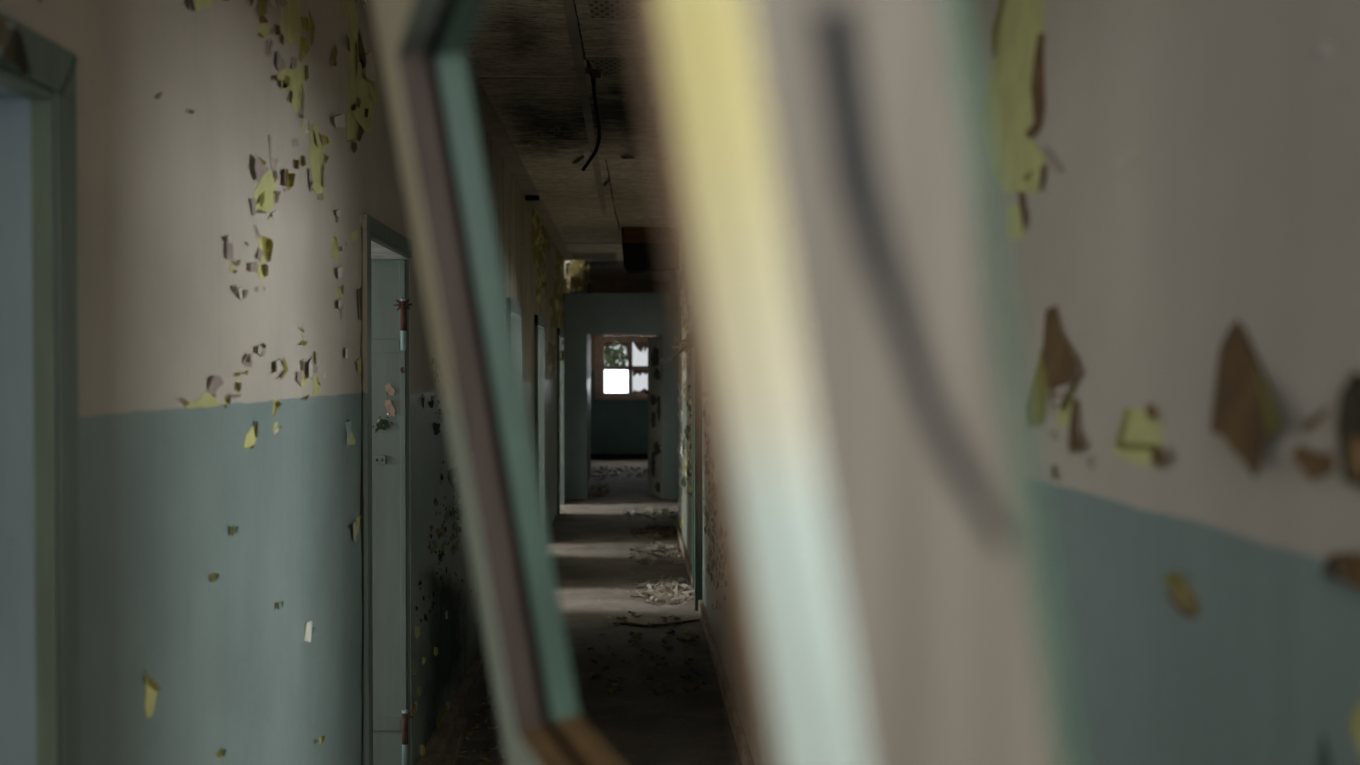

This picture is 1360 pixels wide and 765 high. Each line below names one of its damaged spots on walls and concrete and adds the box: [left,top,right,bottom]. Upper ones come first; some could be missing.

peeling [227,0,381,320]
peeling [983,0,1063,241]
peeling [181,326,326,409]
peeling [244,399,283,449]
peeling [648,344,663,493]
peeling [677,363,721,610]
peeling [1028,305,1095,470]
peeling [1112,403,1167,468]
peeling [1210,319,1285,479]
peeling [1290,370,1360,487]
peeling [144,669,162,718]
peeling [304,621,312,642]